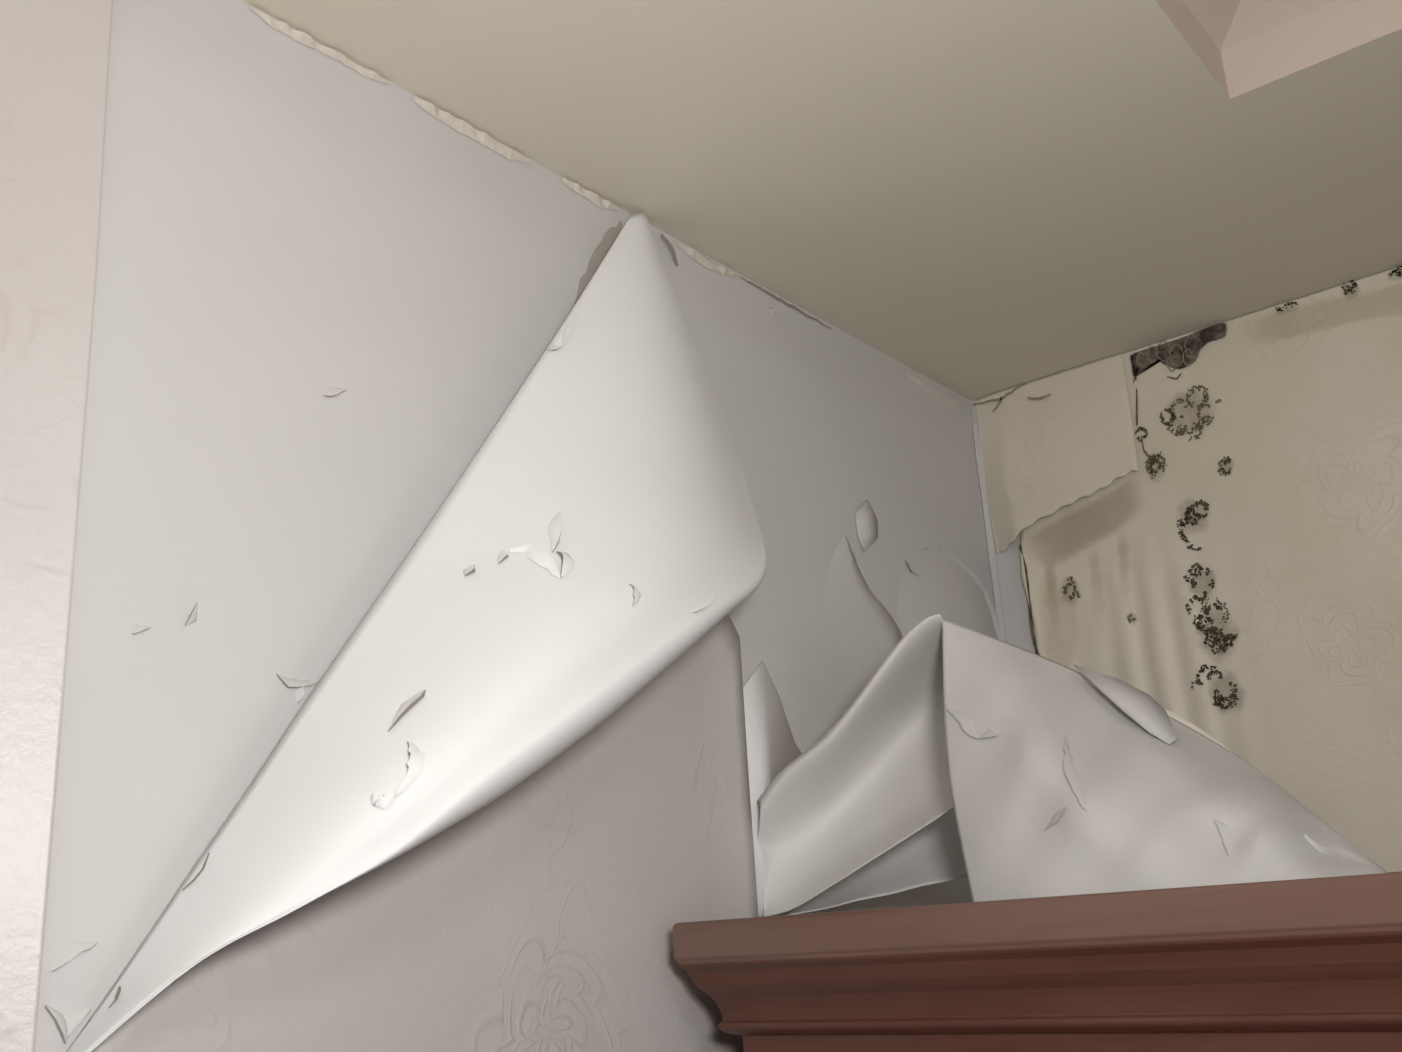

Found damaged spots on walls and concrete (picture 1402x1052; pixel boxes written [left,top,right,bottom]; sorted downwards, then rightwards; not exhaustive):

peeling [67,213,767,1052]
peeling [975,353,1138,554]
water stain [1019,265,1402,872]